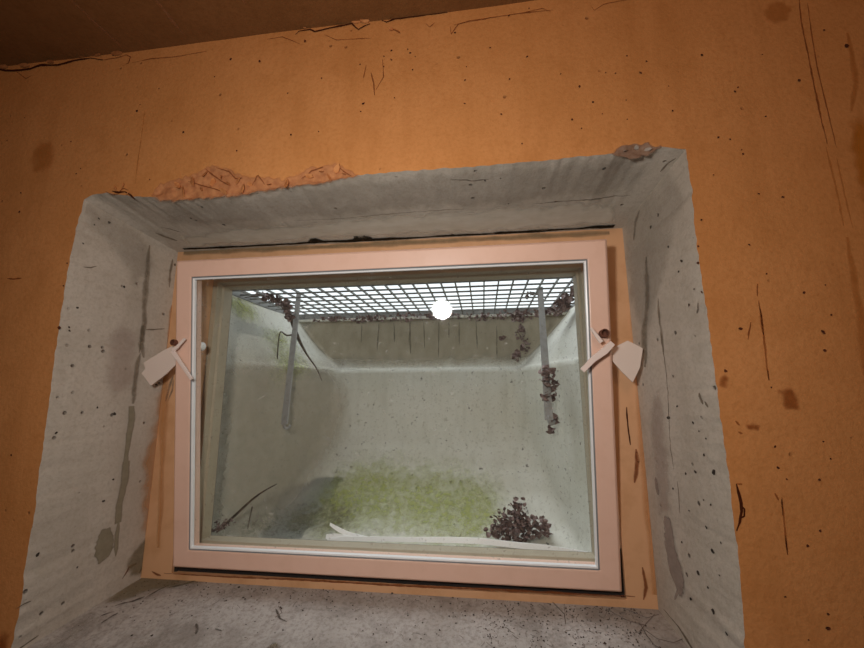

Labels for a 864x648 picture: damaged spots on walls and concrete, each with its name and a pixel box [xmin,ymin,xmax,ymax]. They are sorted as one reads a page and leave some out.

crack [0,51,205,79]
flaking render [149,163,356,201]